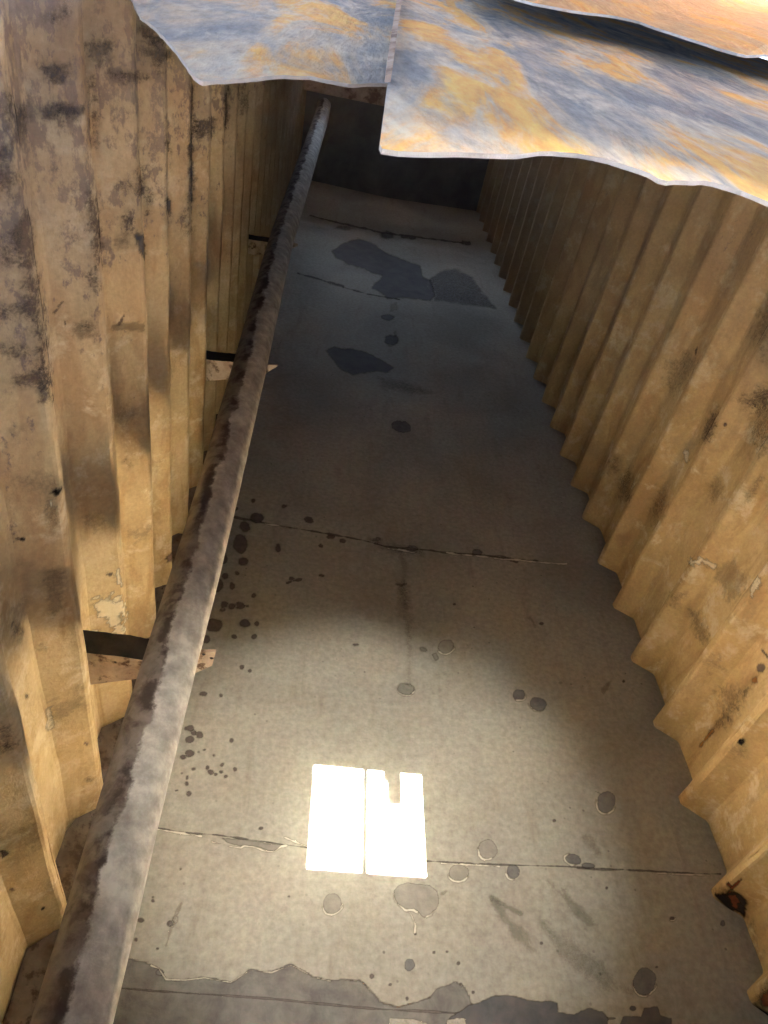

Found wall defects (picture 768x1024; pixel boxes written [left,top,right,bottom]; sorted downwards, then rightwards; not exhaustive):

water stain [332,226,494,308]
water stain [327,347,393,375]
crack [234,516,567,565]
peeling [92,569,128,634]
crack [158,828,311,852]
crack [426,860,721,876]
peeling [113,959,472,1024]
spalling [633,968,657,997]